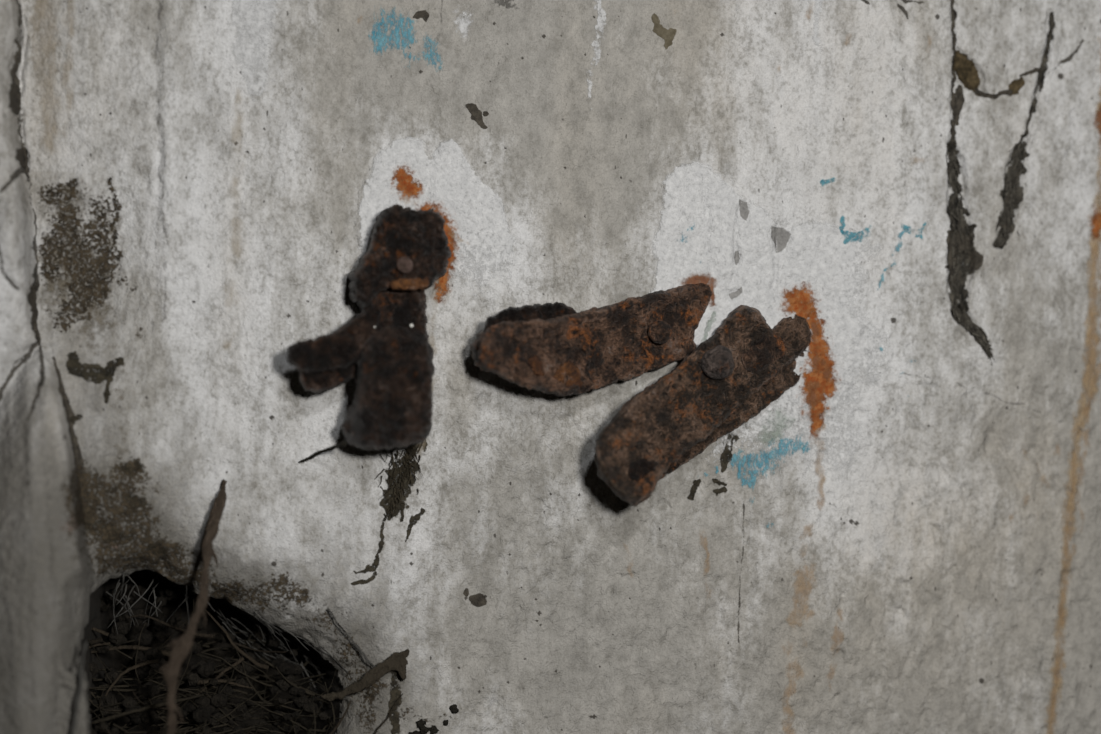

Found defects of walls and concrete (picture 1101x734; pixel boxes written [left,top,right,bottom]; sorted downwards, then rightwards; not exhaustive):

crack [897,0,924,19]
crack [0,0,89,519]
mould [37,177,136,345]
rust [389,166,459,303]
rust [682,275,716,306]
rust [782,284,837,437]
crack [945,0,1084,364]
rust [1063,196,1101,569]
rust [628,458,659,481]
damp [61,450,386,733]